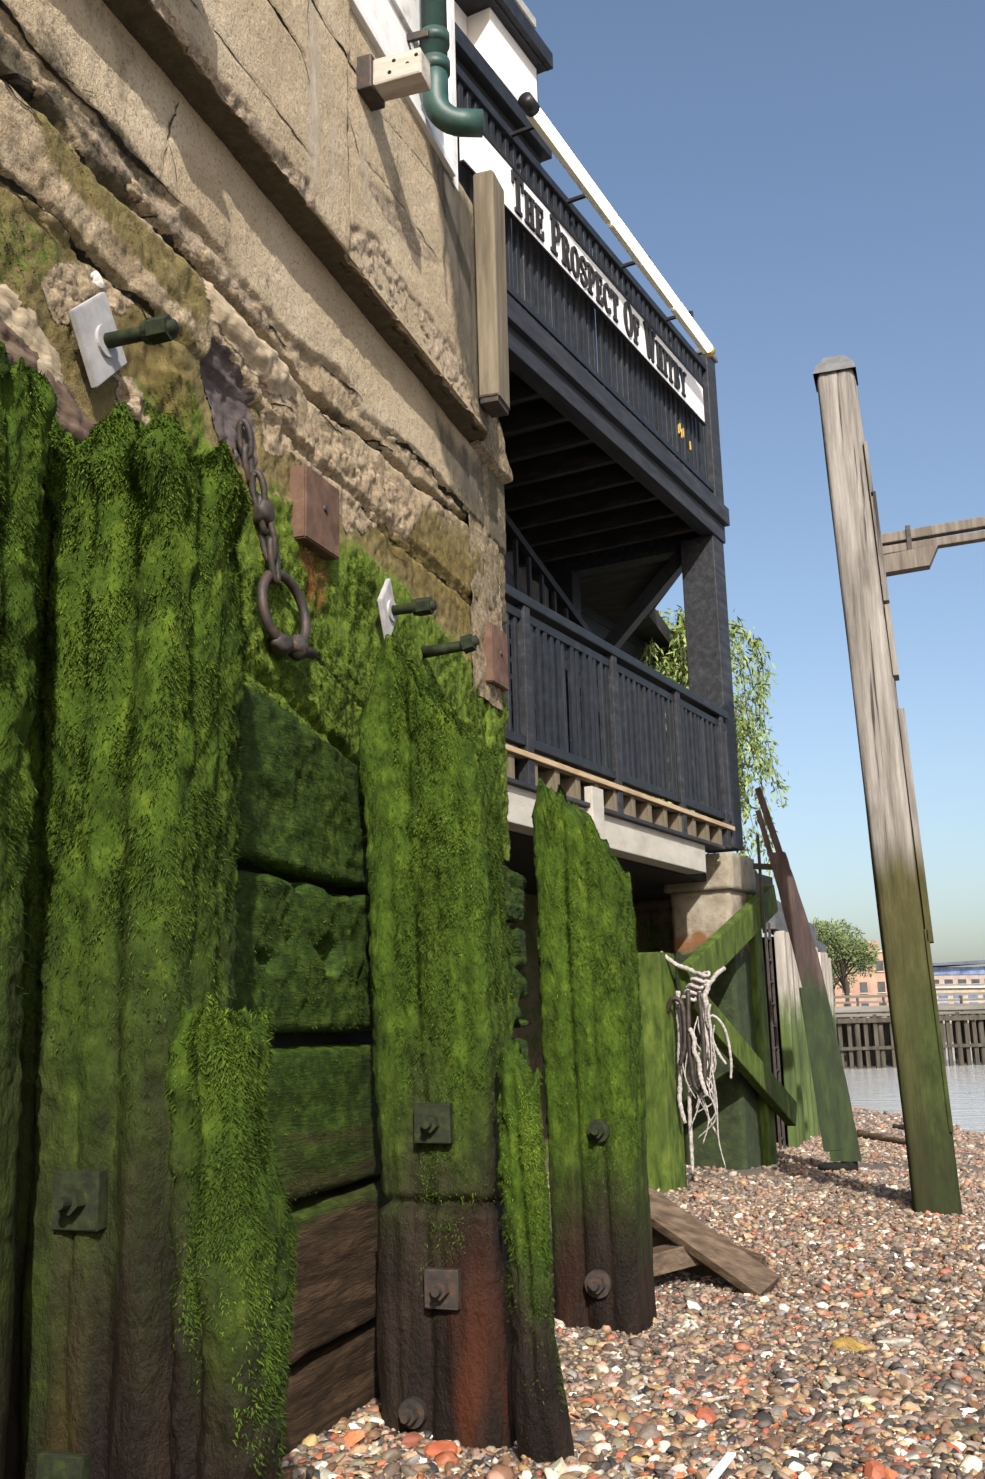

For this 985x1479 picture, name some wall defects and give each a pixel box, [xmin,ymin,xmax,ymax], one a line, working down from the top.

crack [0,0,196,271]
crack [248,323,288,348]